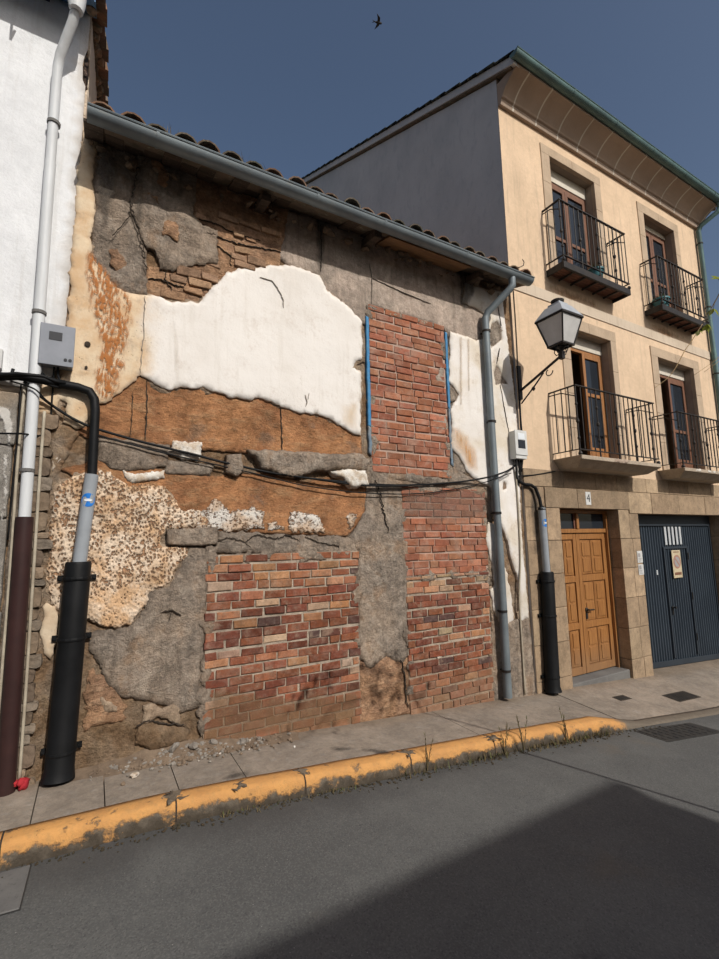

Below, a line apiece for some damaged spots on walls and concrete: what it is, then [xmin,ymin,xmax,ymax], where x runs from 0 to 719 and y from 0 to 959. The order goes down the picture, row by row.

crack [112,167,148,270]
flaking render [39,130,366,462]
spalling [0,394,27,666]
flaking render [40,457,369,660]
crack [375,480,389,533]
flaking render [433,285,530,623]
spalling [141,702,180,725]
spalling [359,656,410,722]